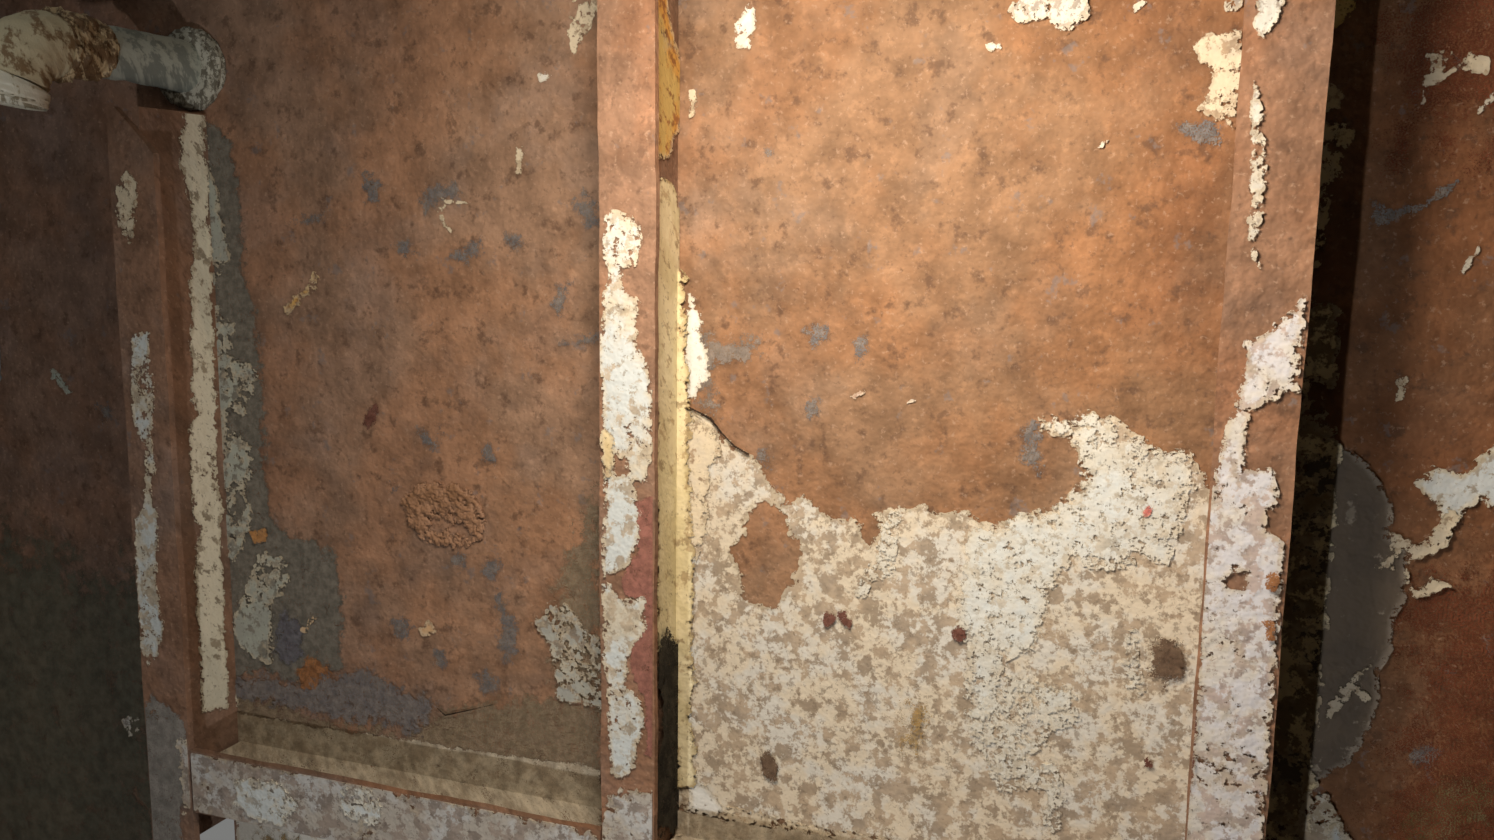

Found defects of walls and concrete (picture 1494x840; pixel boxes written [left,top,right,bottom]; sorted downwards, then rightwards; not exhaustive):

peeling [658,0,680,160]
peeling [1007,0,1090,34]
peeling [1246,84,1268,269]
corrosion [1333,0,1494,203]
peeling [1420,50,1491,105]
peeling [130,331,165,665]
corrosion [363,403,379,430]
peeling [175,113,1494,840]
corrosion [1350,519,1494,840]